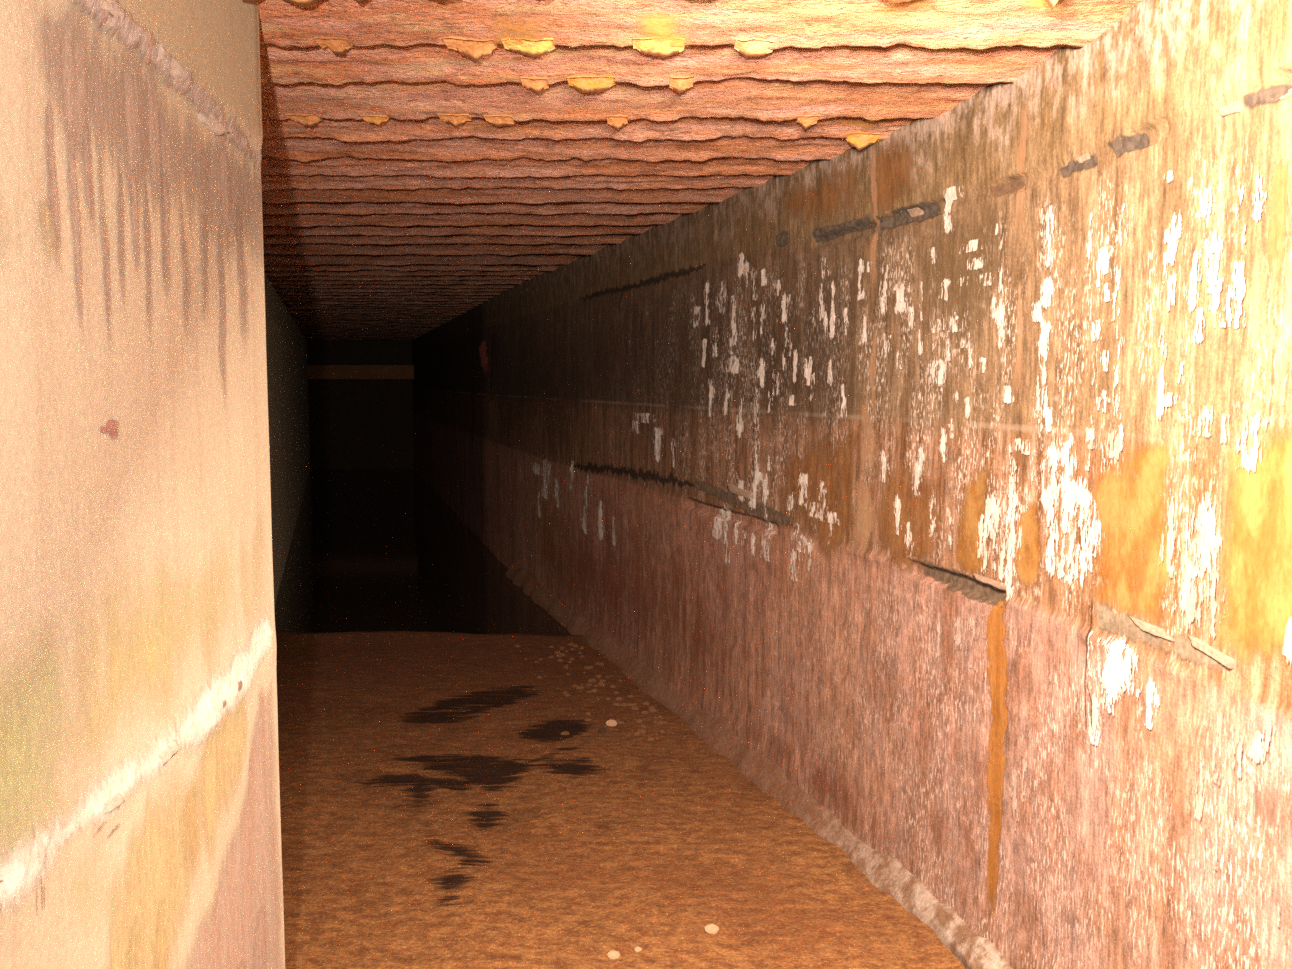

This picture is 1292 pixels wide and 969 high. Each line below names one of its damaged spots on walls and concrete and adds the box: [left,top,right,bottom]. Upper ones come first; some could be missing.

crack [0,618,273,910]
leakage [40,10,262,376]
crack [573,463,695,487]
leakage [693,252,886,582]
leakage [812,219,1007,556]
leakage [943,186,964,235]
corrosion [986,596,1009,906]
efflorescence [975,204,1128,601]
crack [1084,601,1092,725]
efflorescence [1087,629,1160,746]
efflorescence [1158,491,1226,639]
efflorescence [1156,188,1246,420]